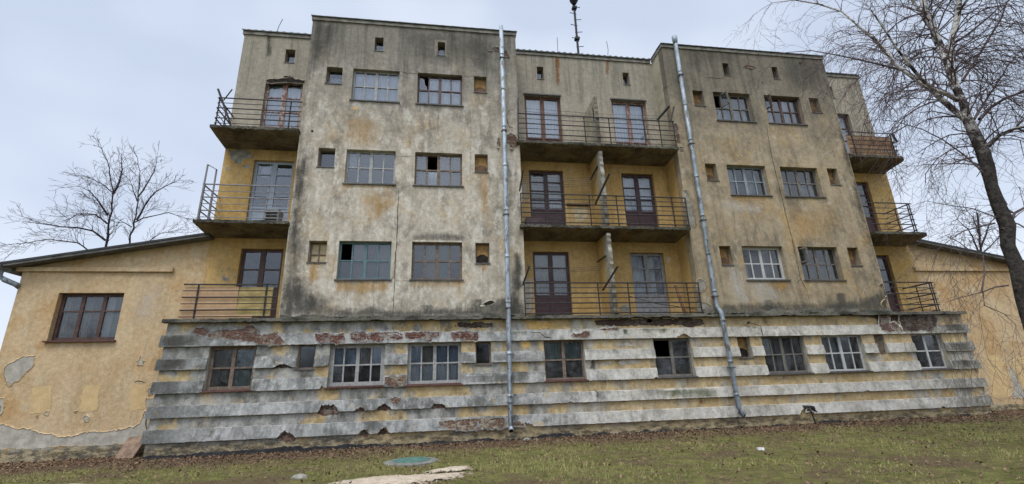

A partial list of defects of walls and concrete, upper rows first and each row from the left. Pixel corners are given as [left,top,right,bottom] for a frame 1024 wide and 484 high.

spalling [570,278,713,339]
spalling [865,283,938,333]
spalling [192,324,285,347]
spalling [314,322,493,345]
flaking render [0,354,154,450]
spalling [317,404,339,416]
spalling [431,404,526,432]